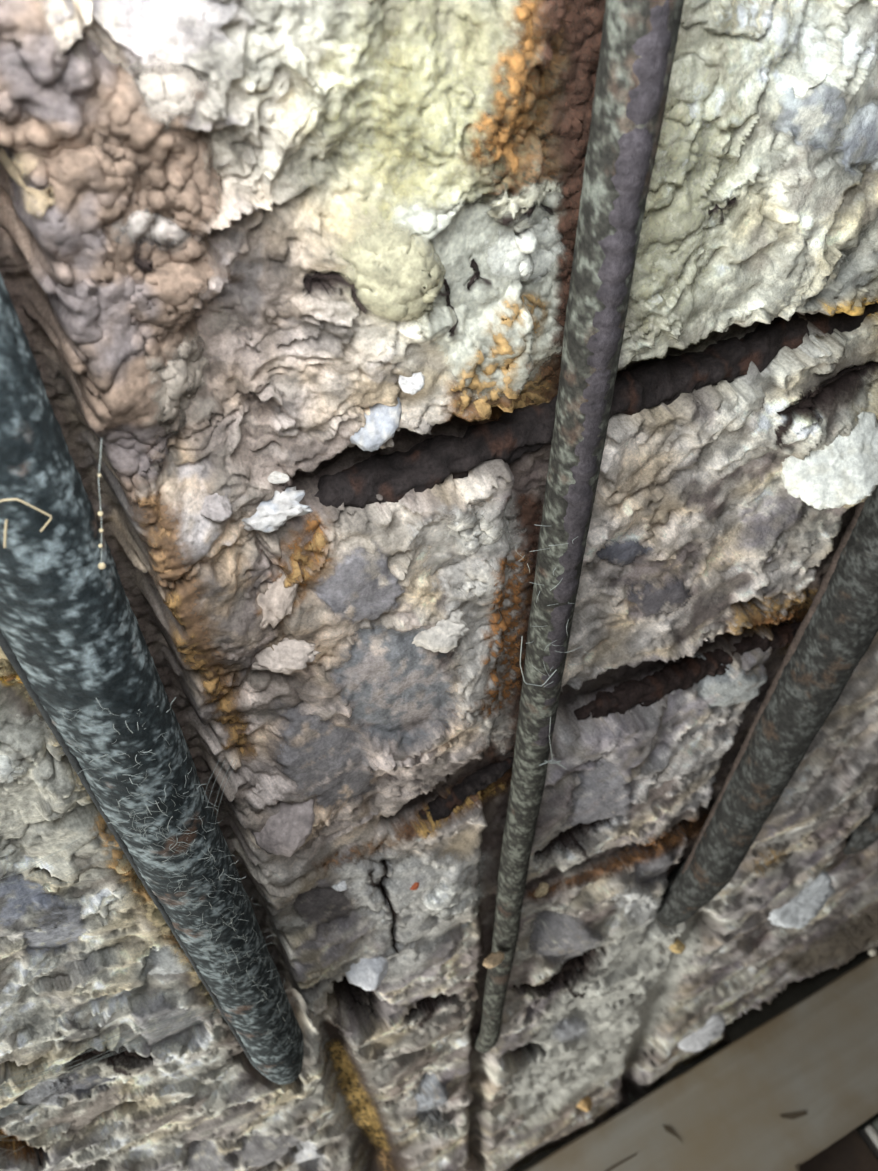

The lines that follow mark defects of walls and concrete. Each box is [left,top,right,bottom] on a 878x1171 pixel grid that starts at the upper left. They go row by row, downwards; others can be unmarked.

peeling [0,0,242,516]
spalling [396,179,565,395]
rust [449,0,606,423]
rust [825,298,878,316]
rust [138,493,256,757]
spalling [250,637,321,674]
spalling [272,499,524,808]
crack [368,860,401,953]
spalling [293,855,483,988]
spalling [507,838,699,1124]
rust [527,811,710,899]
rust [320,1018,409,1171]